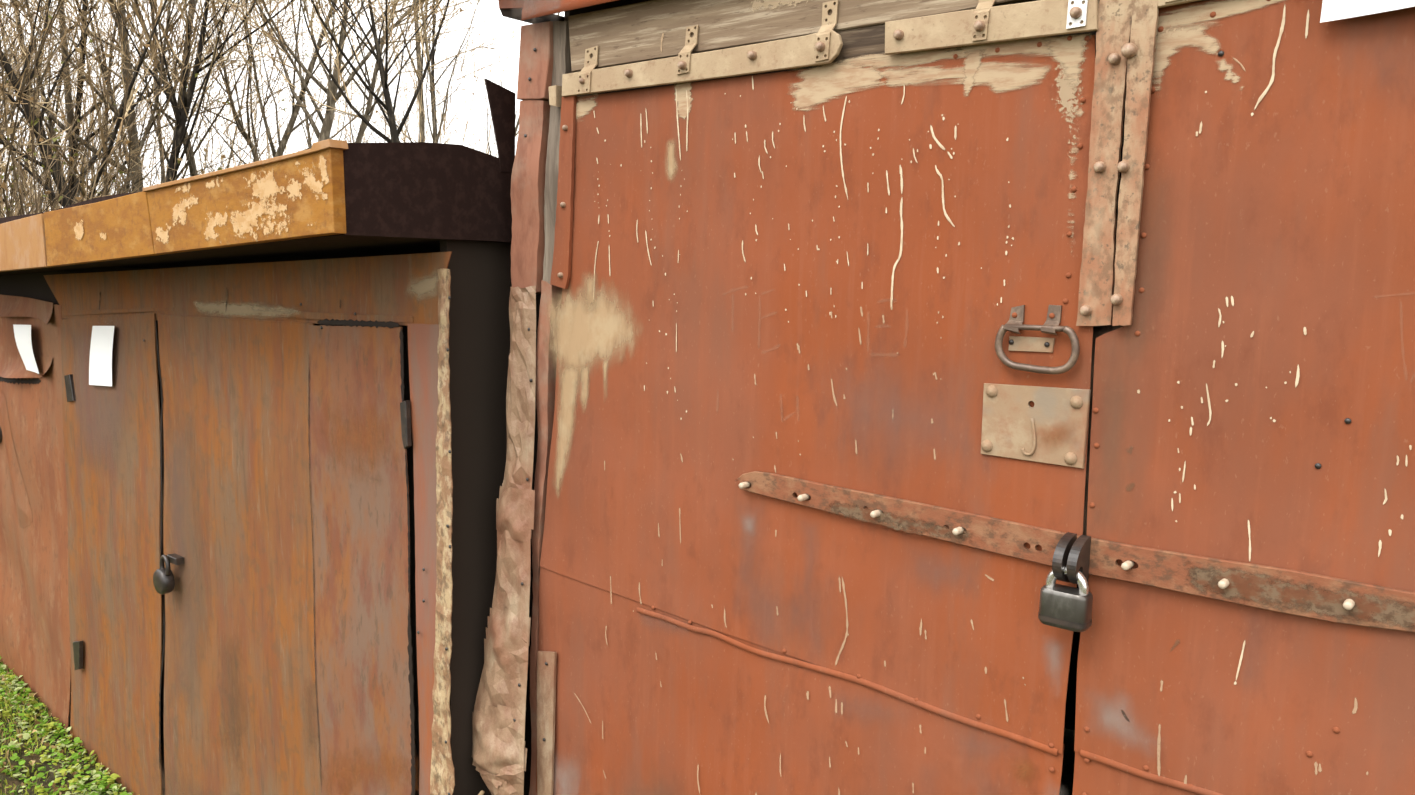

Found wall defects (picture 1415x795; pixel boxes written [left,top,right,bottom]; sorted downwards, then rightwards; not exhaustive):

peeling [674,82,693,118]
peeling [792,34,1089,199]
peeling [668,142,676,177]
peeling [155,155,329,244]
peeling [549,291,633,374]
rust [829,501,969,541]
rust [1184,564,1415,628]